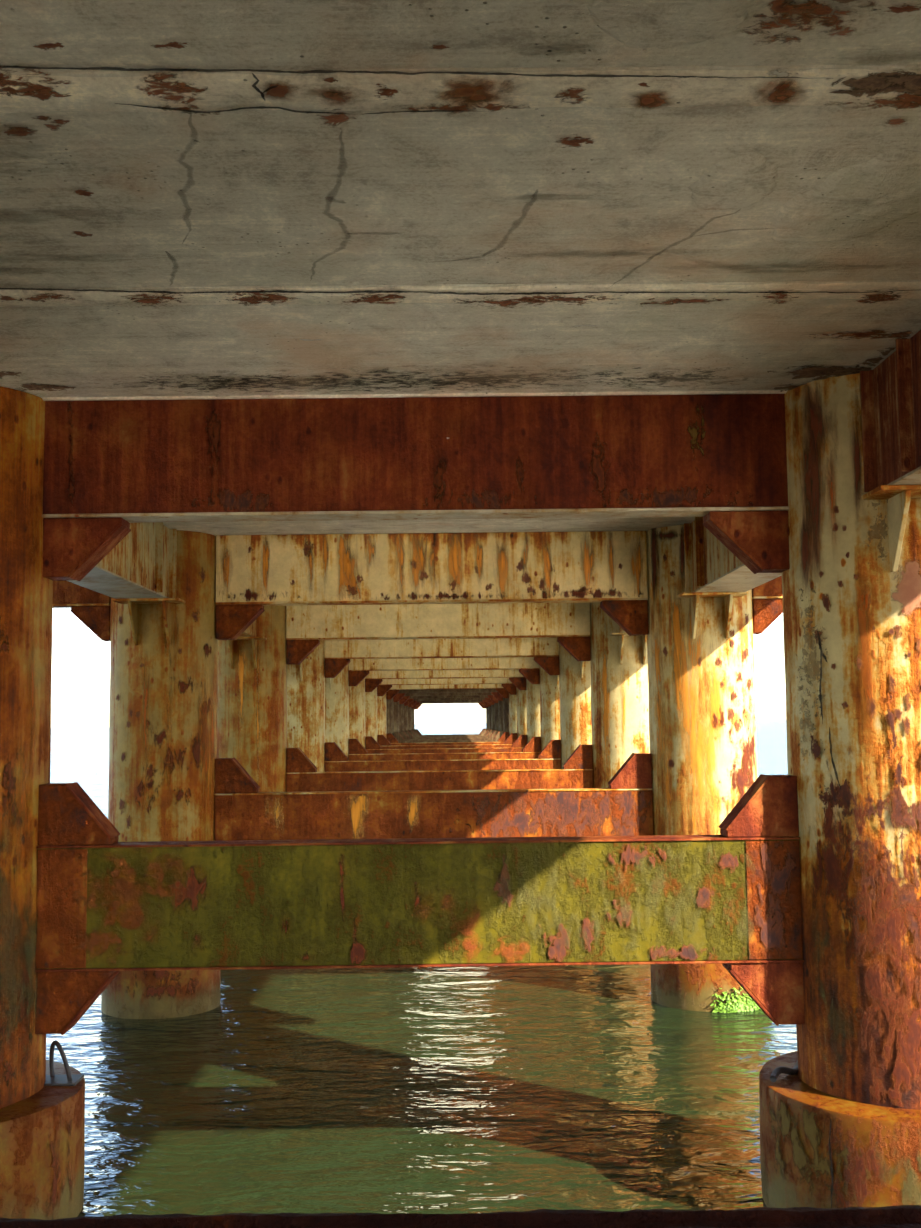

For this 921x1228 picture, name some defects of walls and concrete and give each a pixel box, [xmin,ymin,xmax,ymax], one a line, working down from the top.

corrosion [742,0,856,45]
corrosion [0,68,70,101]
corrosion [137,73,219,115]
corrosion [4,116,70,136]
corrosion [616,486,712,507]
corrosion [801,387,835,581]
corrosion [219,541,300,601]
corrosion [305,535,374,598]
corrosion [533,527,757,831]
corrosion [857,579,873,742]
corrosion [437,652,667,870]
corrosion [810,695,921,1107]